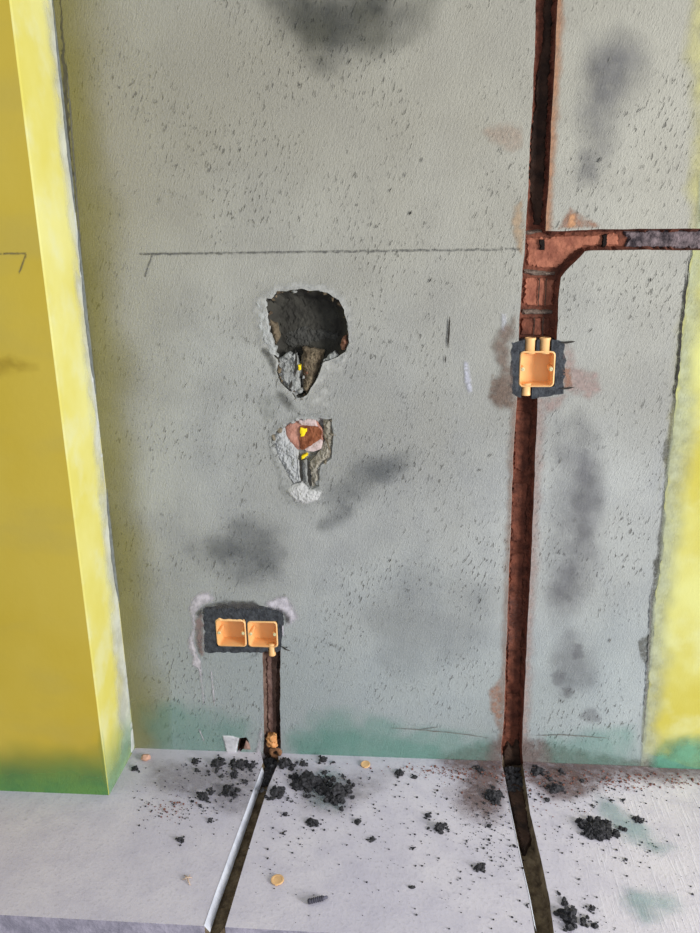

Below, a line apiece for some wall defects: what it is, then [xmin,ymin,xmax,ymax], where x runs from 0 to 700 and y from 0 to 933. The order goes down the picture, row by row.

rust [546,0,562,231]
rust [563,211,596,227]
spalling [270,417,336,504]
spalling [256,286,351,400]
rust [490,326,517,473]
rust [522,398,562,746]